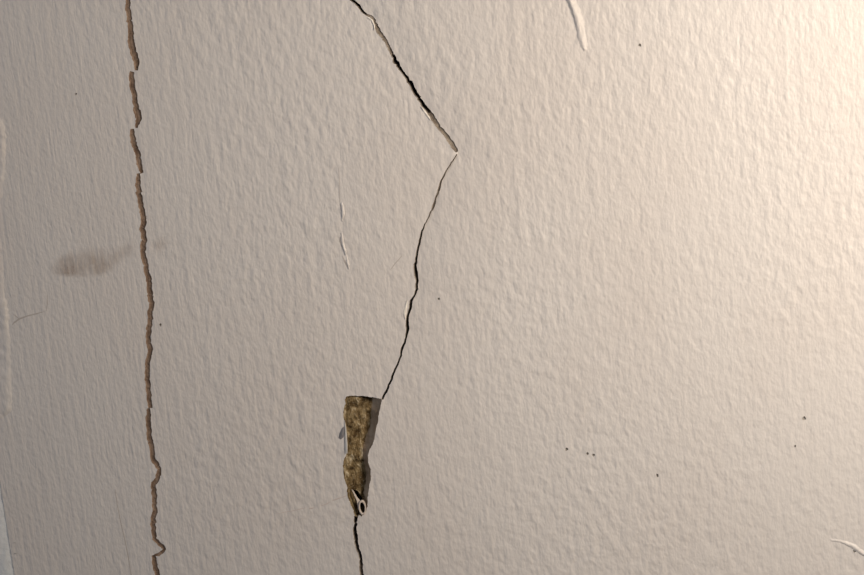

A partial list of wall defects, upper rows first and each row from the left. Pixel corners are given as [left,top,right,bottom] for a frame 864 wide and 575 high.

crack [125,0,166,575]
crack [339,178,350,269]
spalling [339,395,382,518]
crack [350,0,458,400]